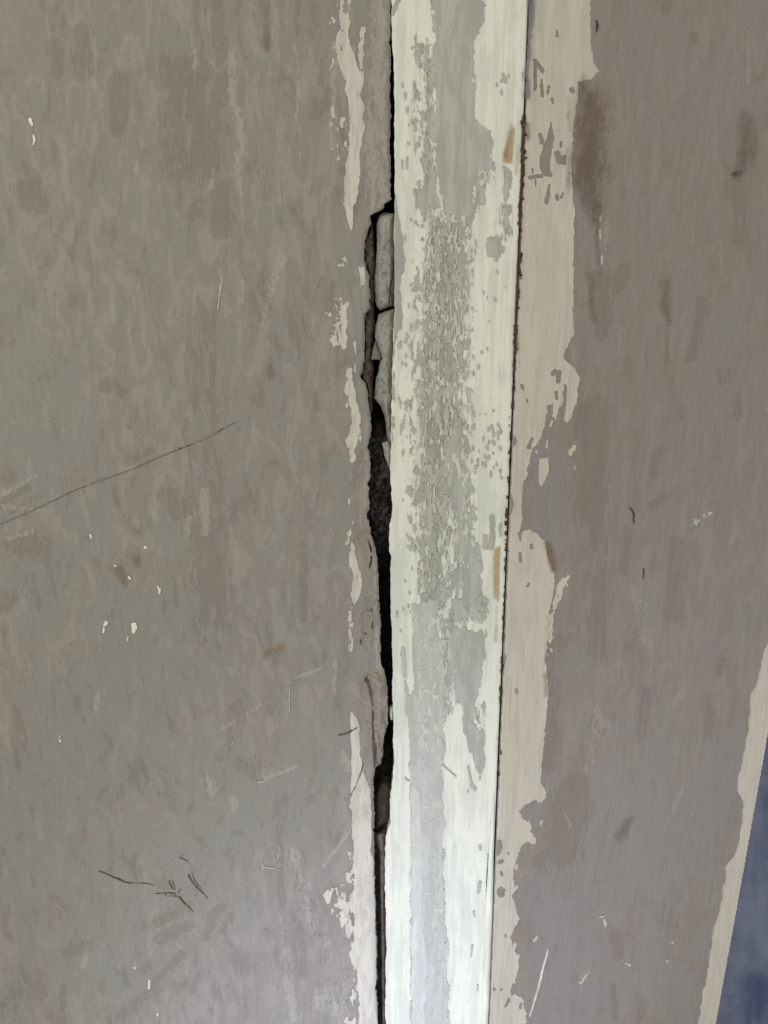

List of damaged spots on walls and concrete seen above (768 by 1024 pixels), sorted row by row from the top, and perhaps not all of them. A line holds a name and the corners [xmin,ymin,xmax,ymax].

peeling [329,0,366,231]
crack [0,422,236,524]
peeling [325,297,362,463]
peeling [338,257,365,285]
crack [350,2,395,1024]
peeling [371,0,599,1024]
corrosion [494,114,530,643]